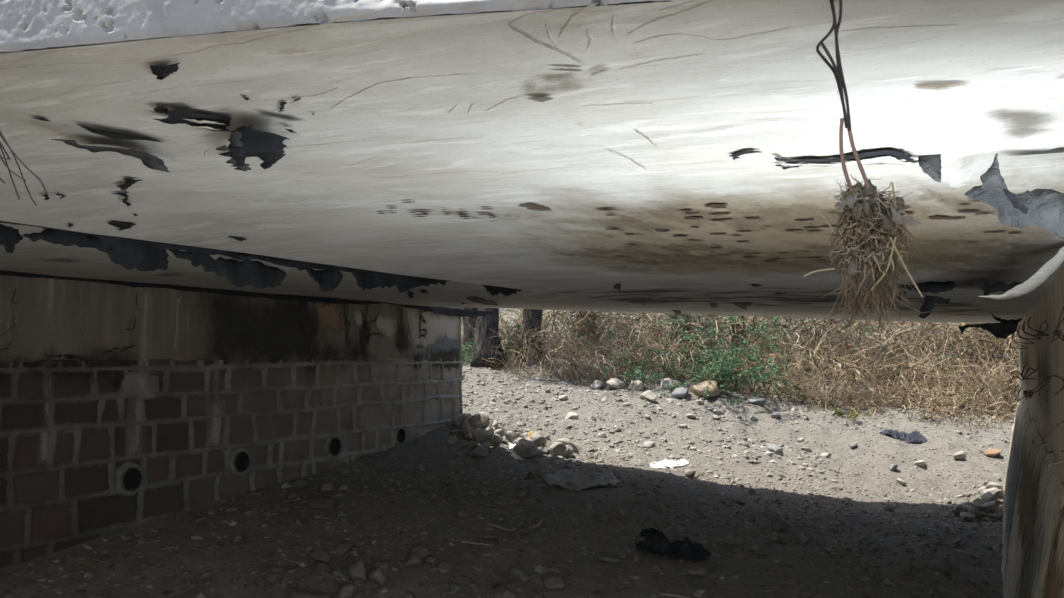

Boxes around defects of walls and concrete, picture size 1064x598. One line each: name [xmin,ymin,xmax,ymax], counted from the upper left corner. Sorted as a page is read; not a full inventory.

peeling [150,62,180,80]
peeling [51,124,170,172]
peeling [153,98,300,172]
water stain [209,295,337,365]
rust [1040,526,1064,598]